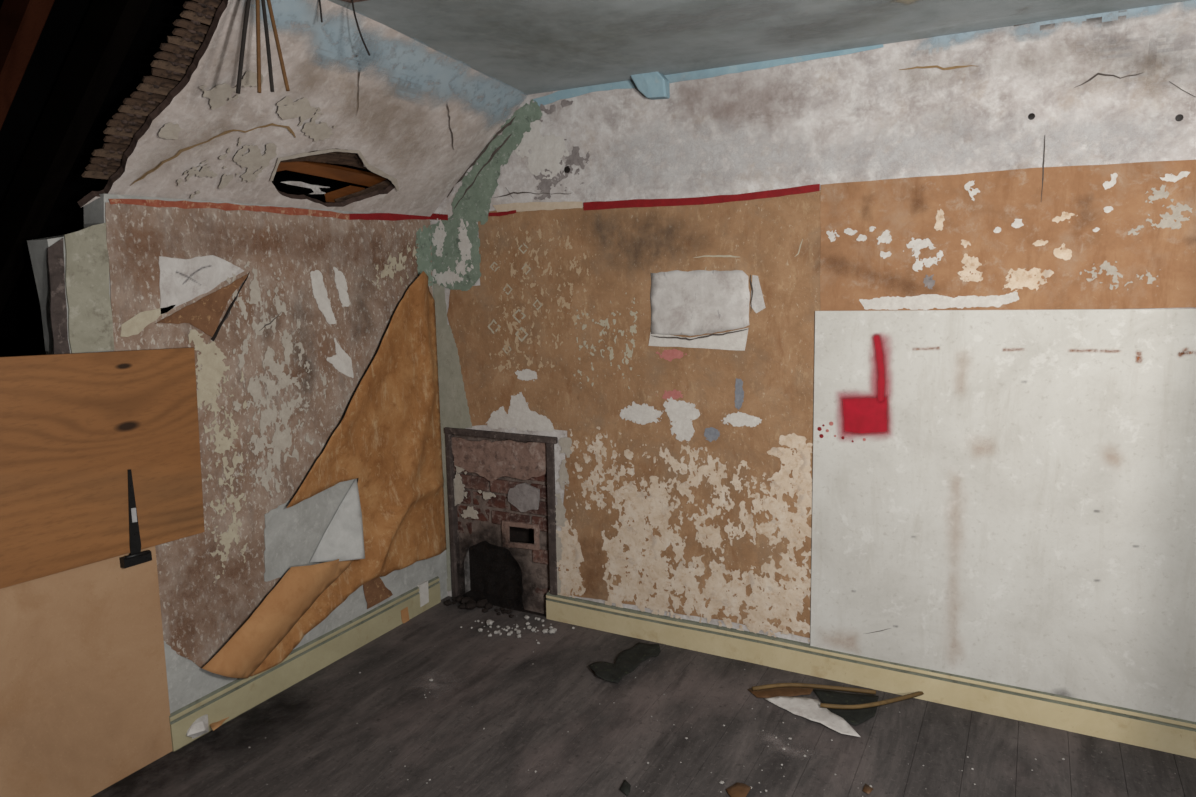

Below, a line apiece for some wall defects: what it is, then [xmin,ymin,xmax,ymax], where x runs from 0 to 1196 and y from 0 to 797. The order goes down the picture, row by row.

crack [1074,73,1195,97]
crack [130,123,296,186]
peeling [964,180,980,201]
peeling [1052,212,1078,223]
peeling [1103,173,1118,190]
peeling [1127,171,1193,235]
peeling [826,209,1072,310]
peeling [1079,261,1158,290]
peeling [293,99,813,650]
peeling [120,255,355,583]